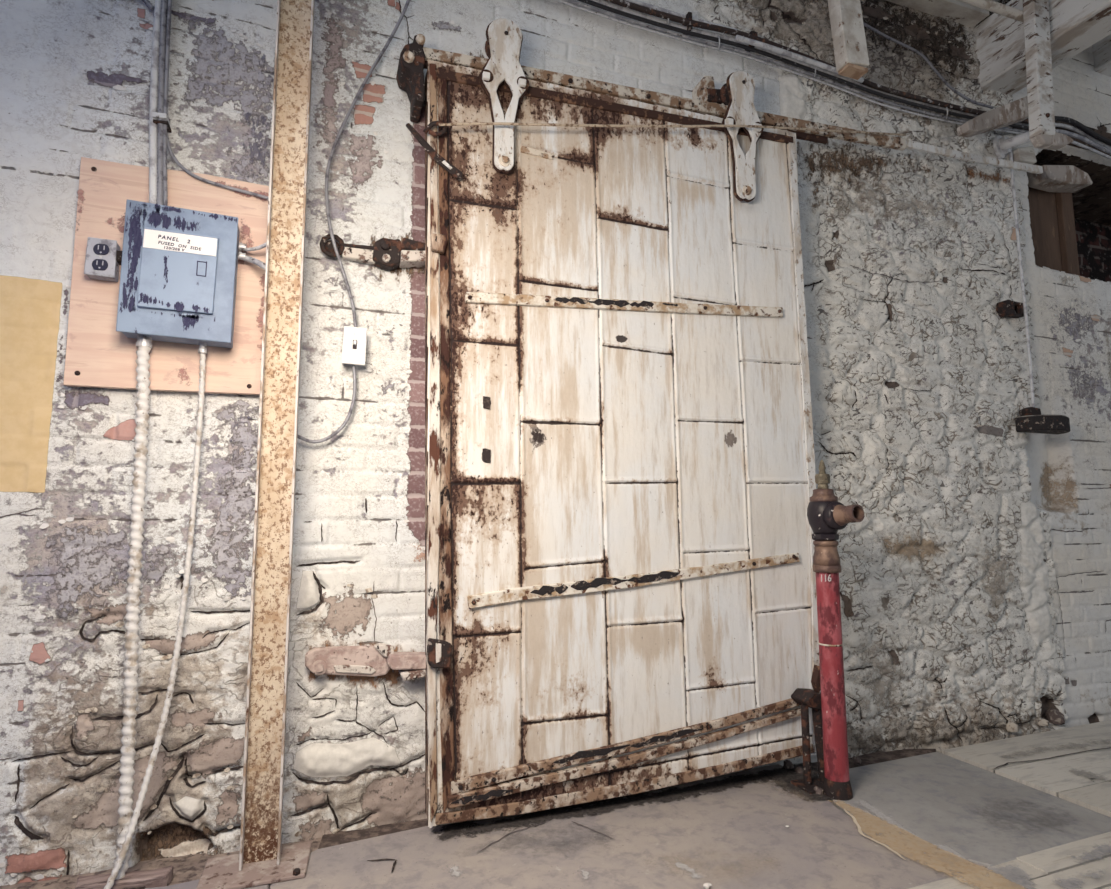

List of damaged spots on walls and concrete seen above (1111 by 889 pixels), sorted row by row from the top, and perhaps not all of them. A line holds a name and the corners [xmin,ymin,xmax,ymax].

peeling [171,8,274,183]
crack [851,265,938,332]
crack [819,431,856,457]
water stain [1040,464,1078,511]
peeling [29,394,259,664]
crack [79,610,250,656]
spalling [310,582,378,643]
crack [0,689,245,840]
spalling [68,707,245,862]
spalling [292,786,340,841]
peeling [5,847,67,885]
crack [64,851,72,875]